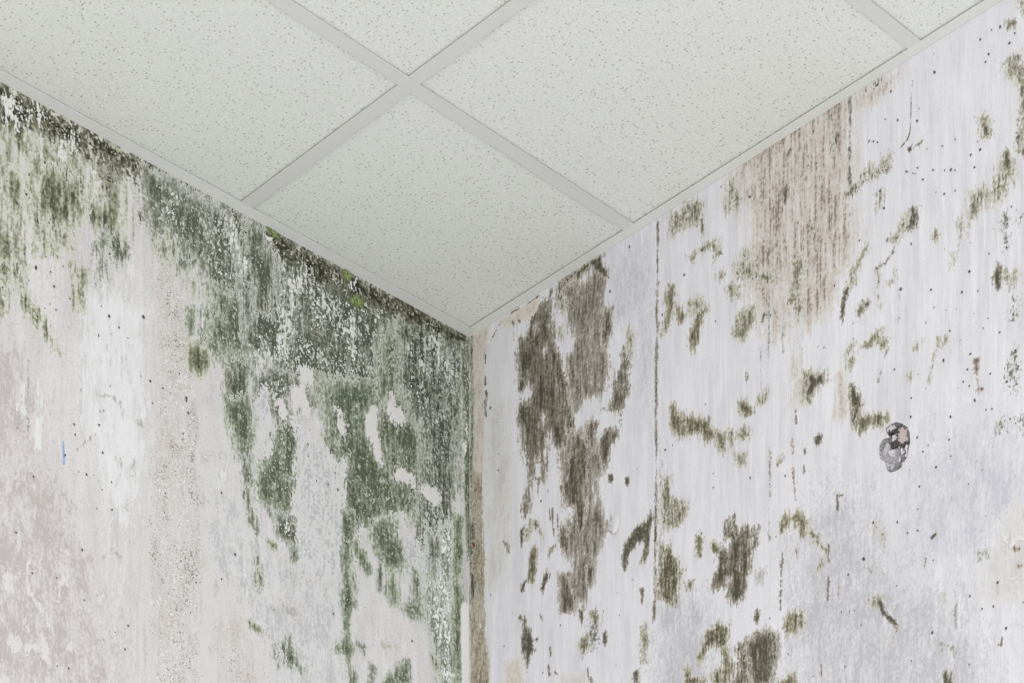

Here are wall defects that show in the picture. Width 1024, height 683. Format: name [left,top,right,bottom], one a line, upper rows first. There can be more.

damp [848,63,906,116]
mould [843,139,923,215]
mould [885,46,1024,292]
damp [839,240,898,326]
damp [0,84,809,683]
spalling [879,422,910,473]
damp [621,325,1024,683]